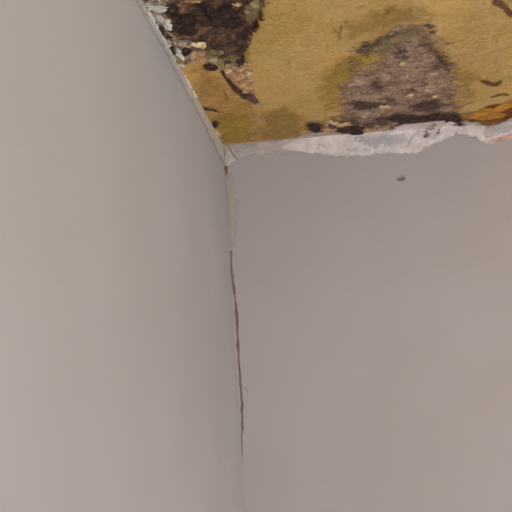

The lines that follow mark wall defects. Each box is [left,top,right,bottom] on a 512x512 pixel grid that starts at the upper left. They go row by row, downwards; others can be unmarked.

flaking render [137,0,270,160]
peeling [232,120,512,159]
leakage [321,8,473,132]
corrosion [463,100,512,126]
crack [230,251,248,452]